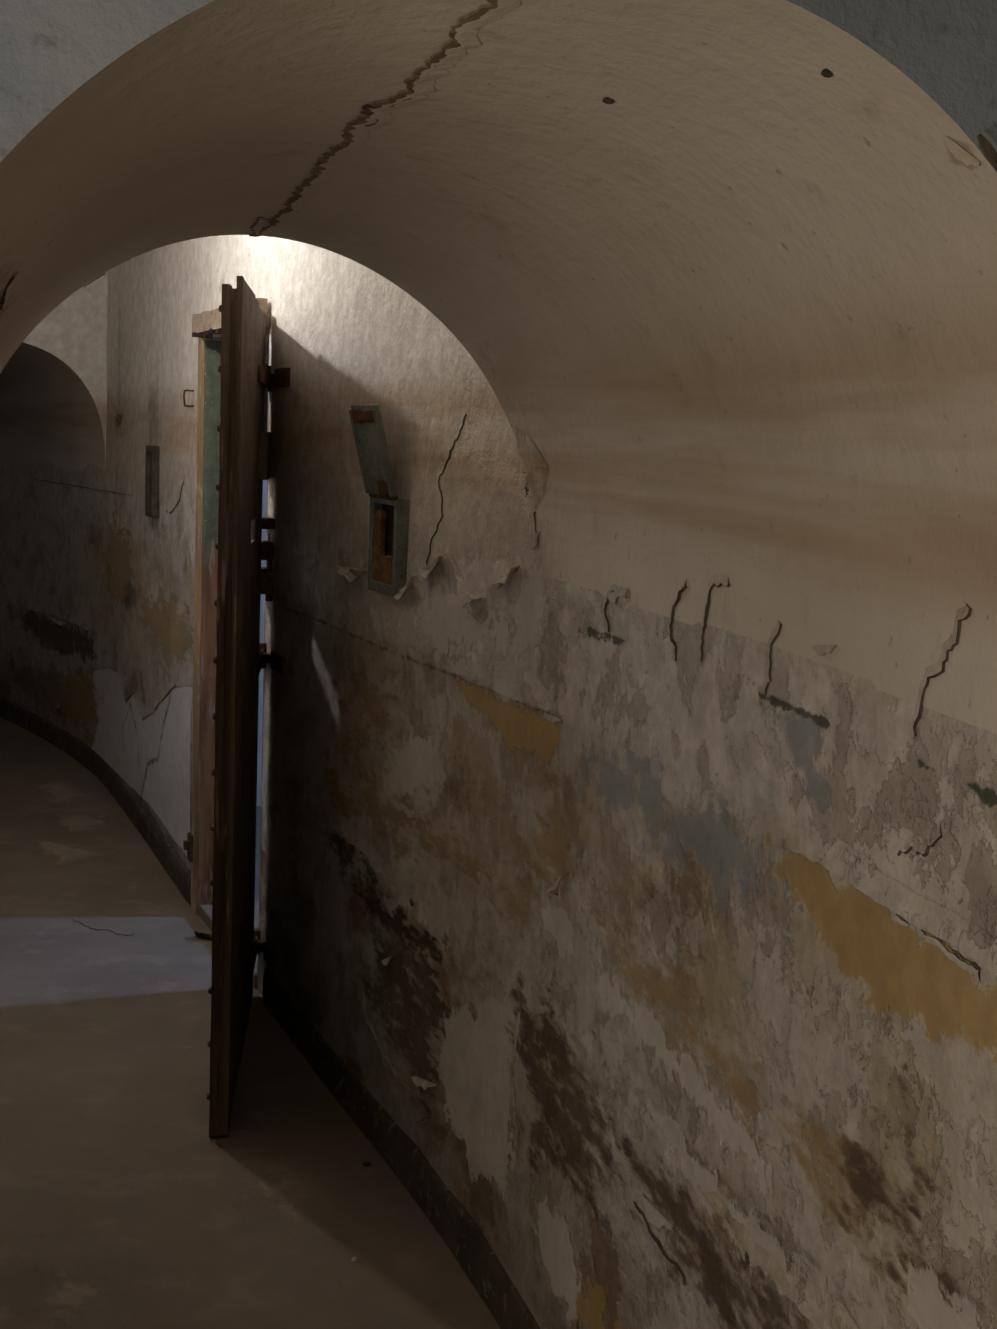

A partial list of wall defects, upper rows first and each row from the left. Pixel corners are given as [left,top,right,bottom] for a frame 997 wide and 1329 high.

crack [249,0,521,237]
crack [425,410,466,566]
crack [668,574,730,662]
crack [762,622,782,695]
crack [910,604,972,740]
peeling [92,658,193,856]
crack [895,824,942,857]
peeling [766,819,997,1063]
water stain [784,1120,959,1313]